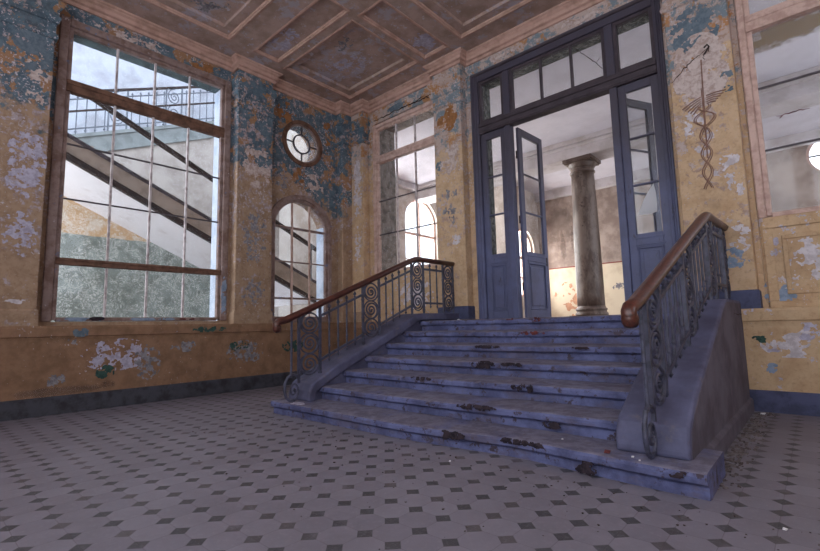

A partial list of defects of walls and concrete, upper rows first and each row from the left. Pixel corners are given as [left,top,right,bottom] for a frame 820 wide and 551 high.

peeling [11,29,53,106]
crack [375,94,430,121]
peeling [670,4,733,157]
peeling [5,131,47,198]
peeling [243,145,271,196]
peeling [713,153,745,195]
peeling [1,211,38,257]
peeling [353,161,362,261]
peeling [718,220,751,268]
peeling [778,236,820,301]
peeling [64,317,161,380]
peeling [752,322,817,374]